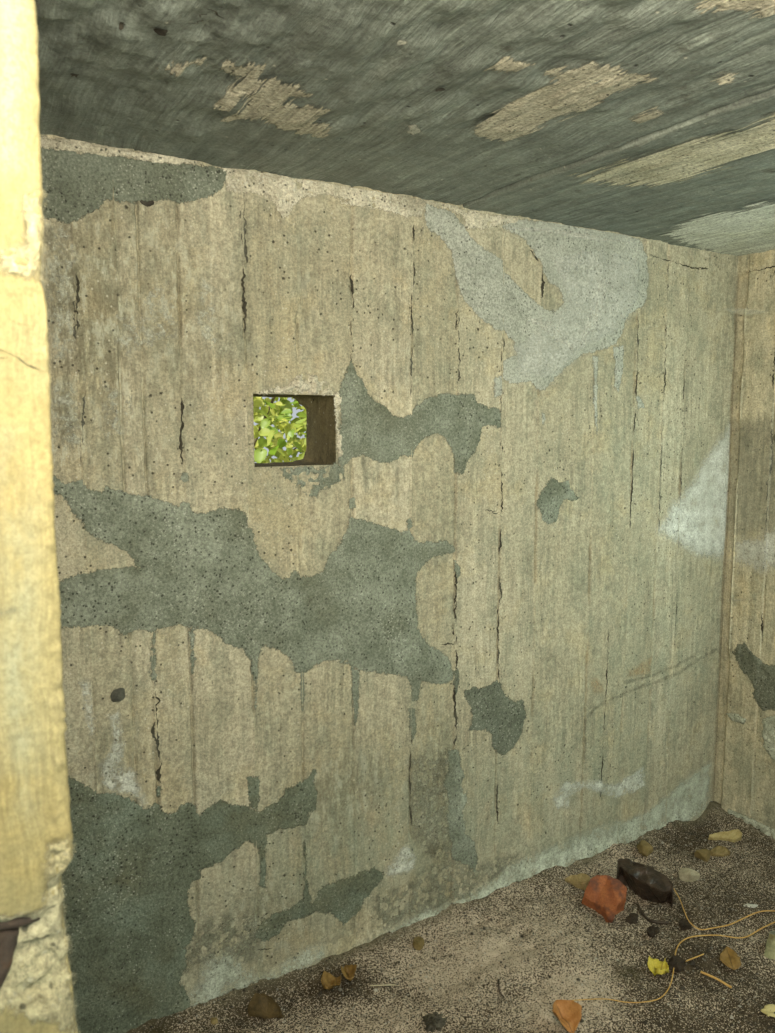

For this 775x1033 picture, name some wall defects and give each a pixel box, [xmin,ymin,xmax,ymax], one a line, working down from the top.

peeling [694,0,775,19]
peeling [157,56,207,77]
peeling [214,59,332,138]
peeling [474,56,658,142]
peeling [711,71,738,85]
peeling [569,113,775,187]
peeling [660,201,775,256]
spalling [0,839,77,1033]